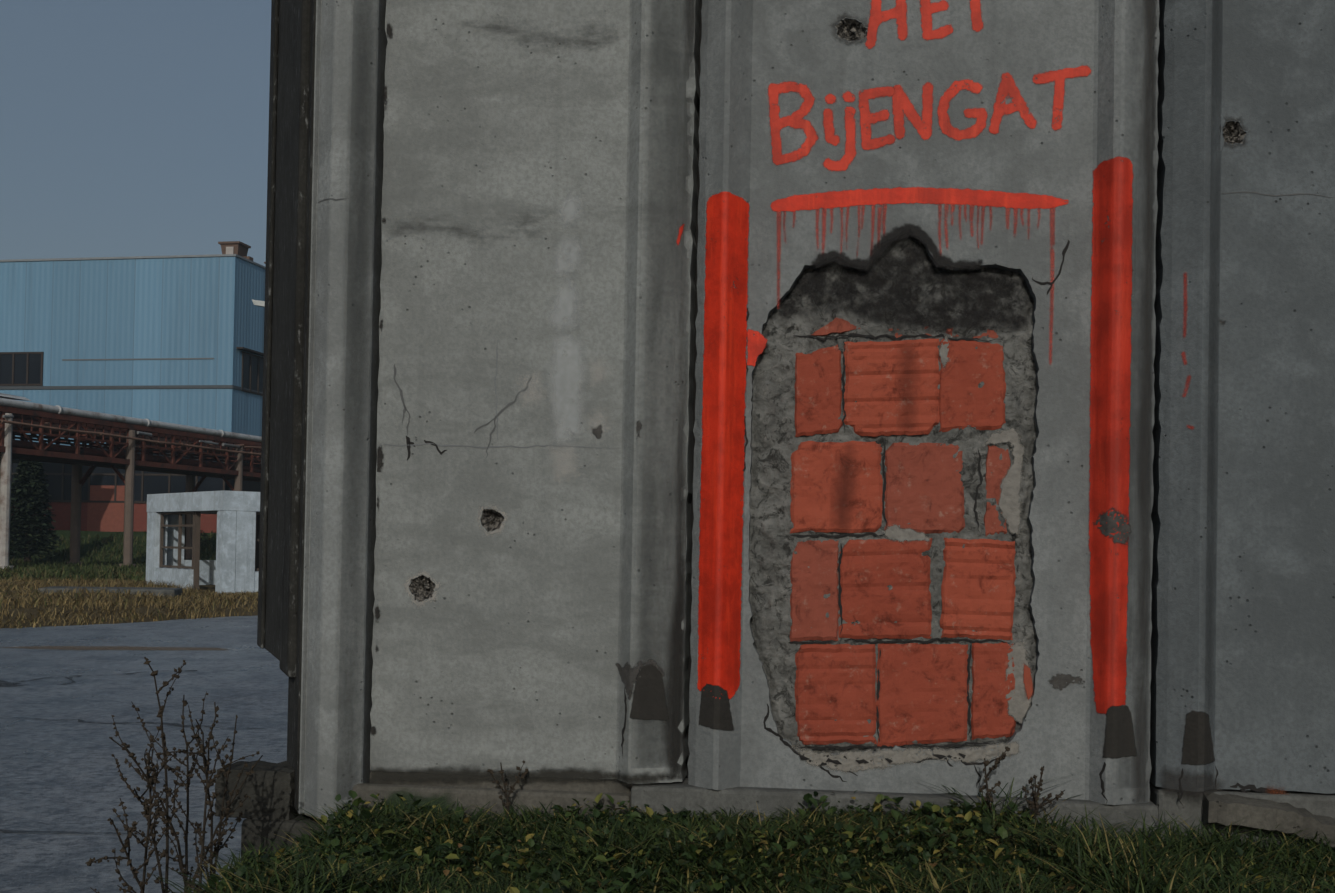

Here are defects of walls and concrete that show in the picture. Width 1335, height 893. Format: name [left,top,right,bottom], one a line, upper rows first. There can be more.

spalling [833,16,868,44]
spalling [1222,119,1246,148]
crack [1032,240,1070,295]
crack [379,341,615,460]
spalling [479,507,506,534]
spalling [405,572,439,605]
spalling [792,742,1019,772]